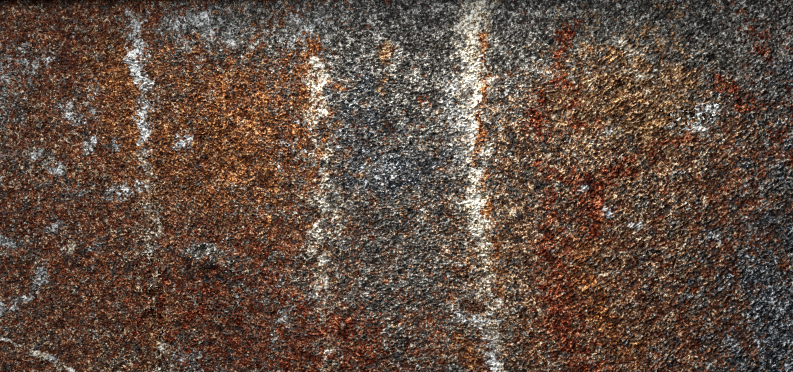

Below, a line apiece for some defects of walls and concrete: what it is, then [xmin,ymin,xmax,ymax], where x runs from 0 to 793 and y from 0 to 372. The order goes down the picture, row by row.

leakage [103,11,177,372]
leakage [173,134,193,152]
rust [72,21,387,372]
leakage [264,1,346,372]
leakage [438,0,508,372]
rust [470,0,765,372]
rust [737,18,793,82]
rust [768,127,793,168]